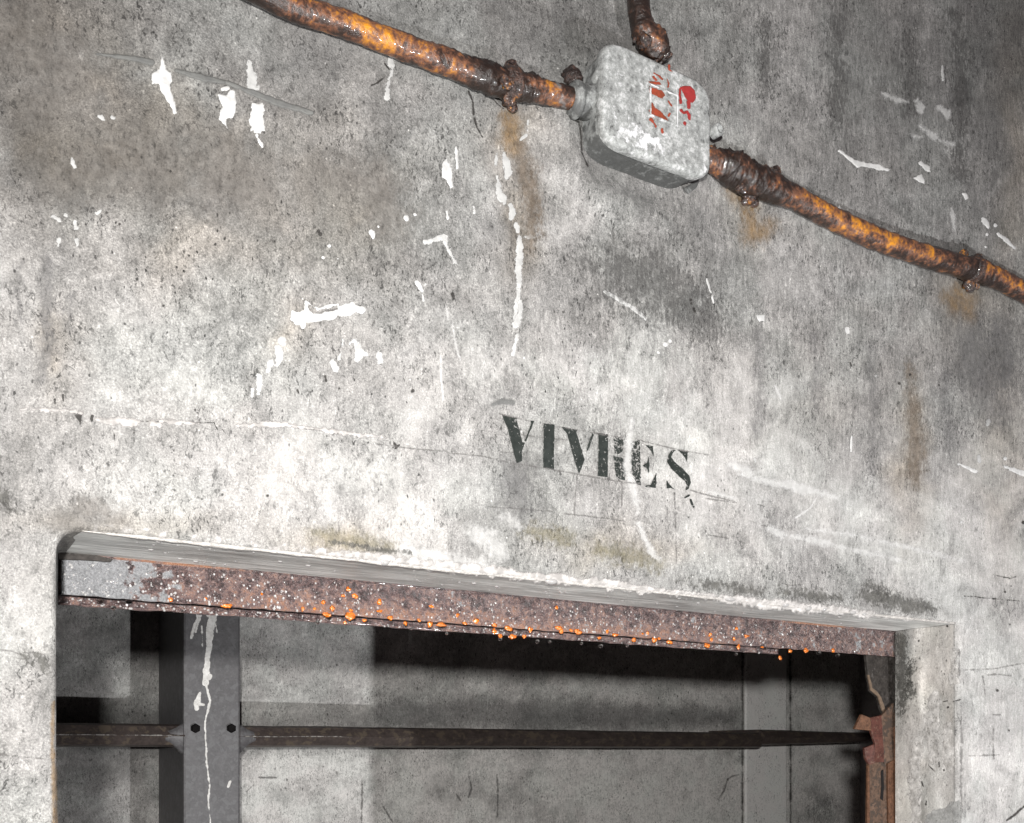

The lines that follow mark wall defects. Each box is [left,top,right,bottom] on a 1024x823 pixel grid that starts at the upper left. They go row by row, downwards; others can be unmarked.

corrosion [301,586,533,639]